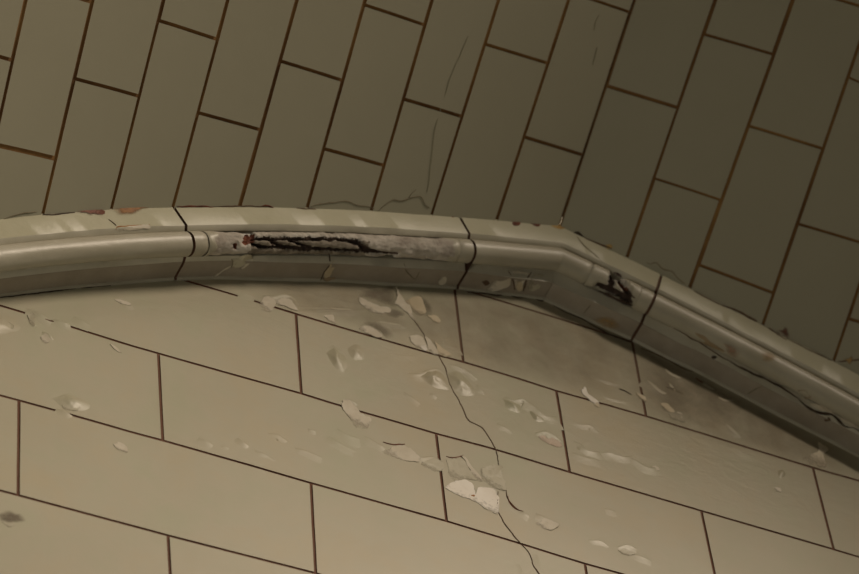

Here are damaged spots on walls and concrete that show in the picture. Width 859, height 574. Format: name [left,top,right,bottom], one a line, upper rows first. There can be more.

peeling [237,291,300,311]
spalling [204,231,461,277]
peeling [318,287,463,357]
spalling [584,263,642,306]
crack [553,298,693,372]
crack [437,354,499,465]
peeling [581,377,647,407]
crack [674,328,859,431]
spalling [323,399,560,530]
water stain [2,513,21,527]
crack [497,490,545,574]